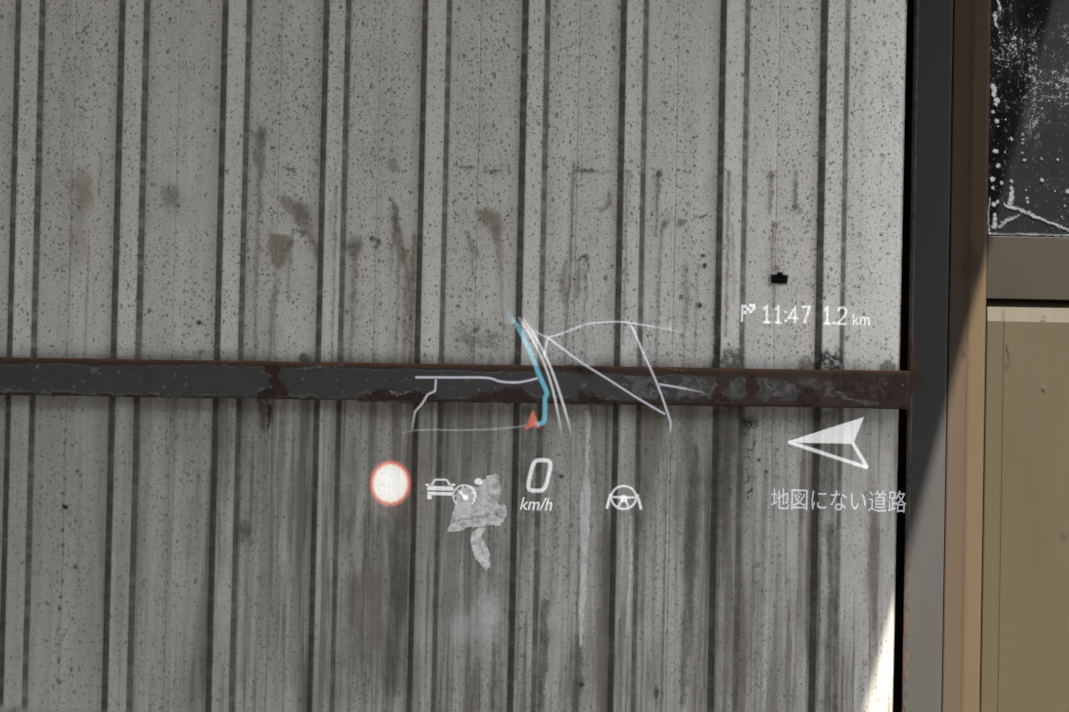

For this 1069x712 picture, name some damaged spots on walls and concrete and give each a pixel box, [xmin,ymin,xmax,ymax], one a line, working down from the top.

damp [254,129,309,286]
damp [392,208,415,363]
corrosion [255,365,288,431]
corrosion [355,389,443,405]
corrosion [471,388,536,405]
corrosion [569,365,603,374]
damp [522,408,534,520]
damp [573,410,591,710]